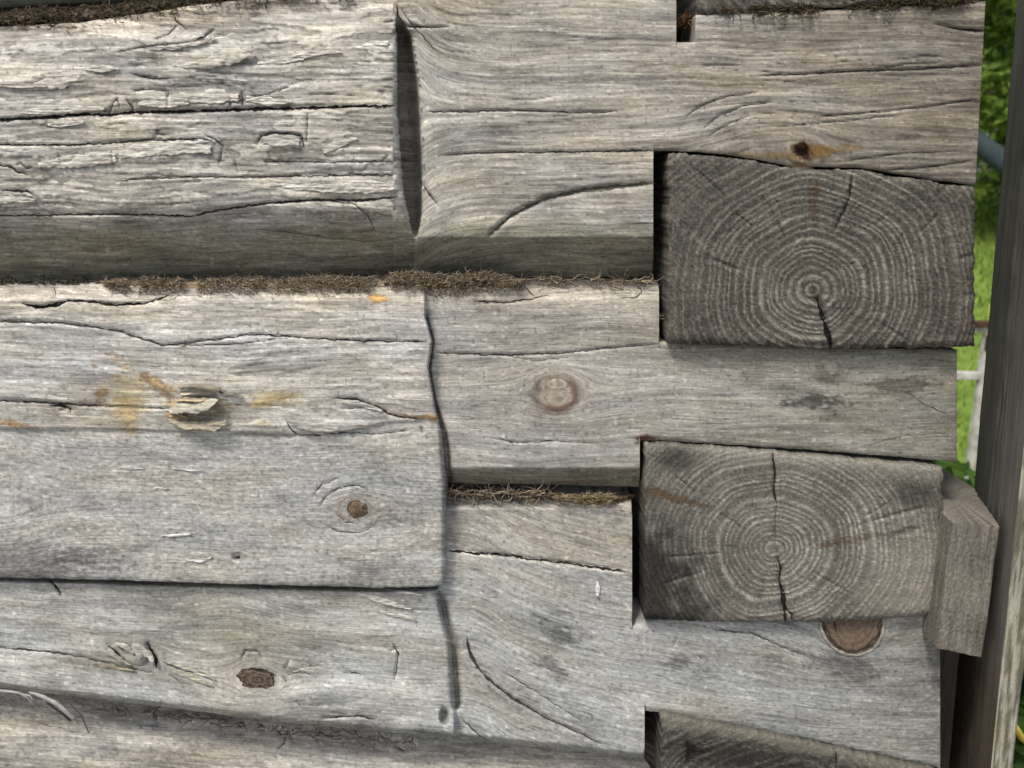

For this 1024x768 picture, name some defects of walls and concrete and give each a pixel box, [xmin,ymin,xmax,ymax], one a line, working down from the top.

crack [0,12,398,242]
crack [0,285,658,361]
crack [815,295,832,349]
peeling [165,383,245,432]
crack [449,550,625,572]
crack [715,453,809,657]